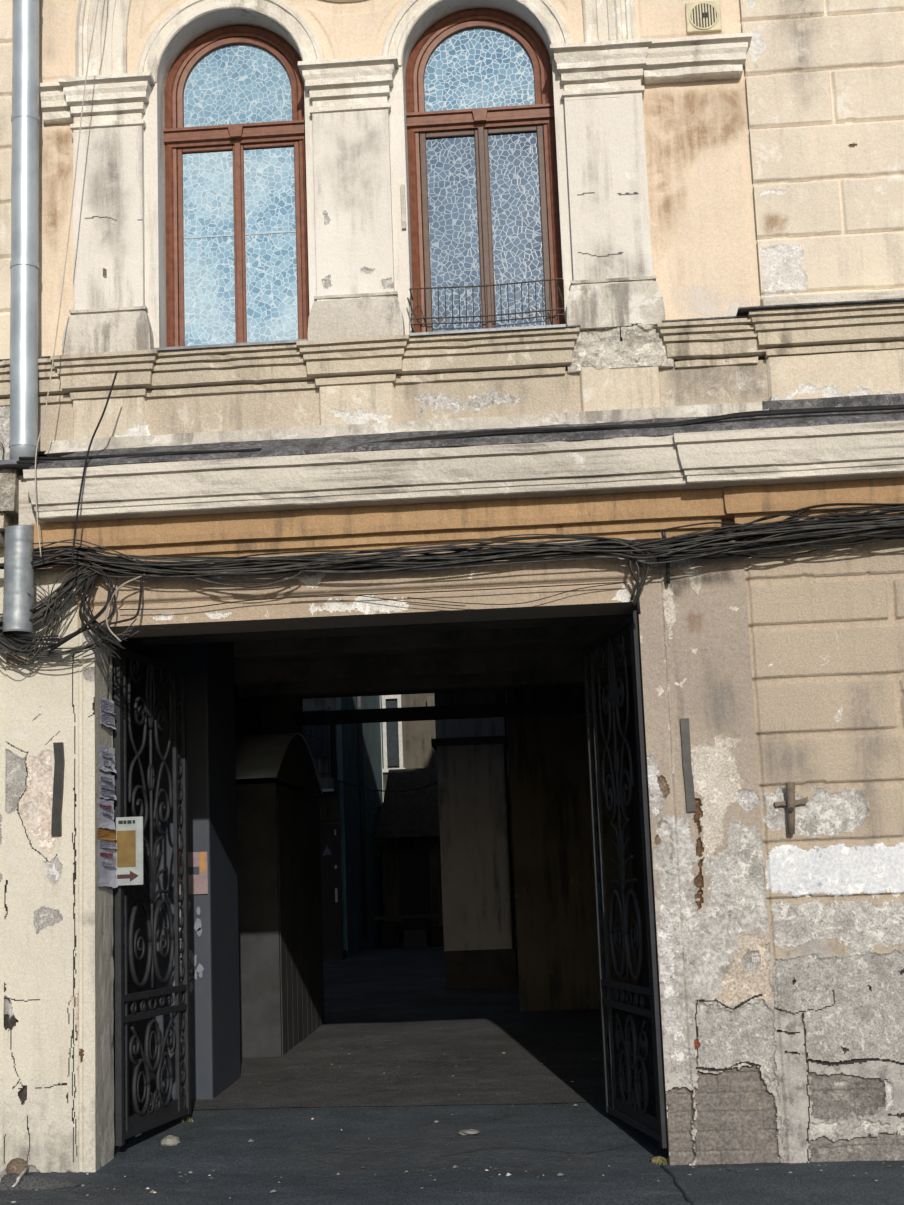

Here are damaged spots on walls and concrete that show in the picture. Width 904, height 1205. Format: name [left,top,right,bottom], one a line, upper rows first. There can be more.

peeling [760,243,808,297]
spalling [570,323,672,367]
peeling [415,389,524,419]
peeling [296,572,409,616]
peeling [0,745,63,886]
crack [2,880,10,919]
peeling [33,906,63,935]
crack [4,653,95,1163]
spalling [647,734,904,1166]
crack [694,990,904,1163]